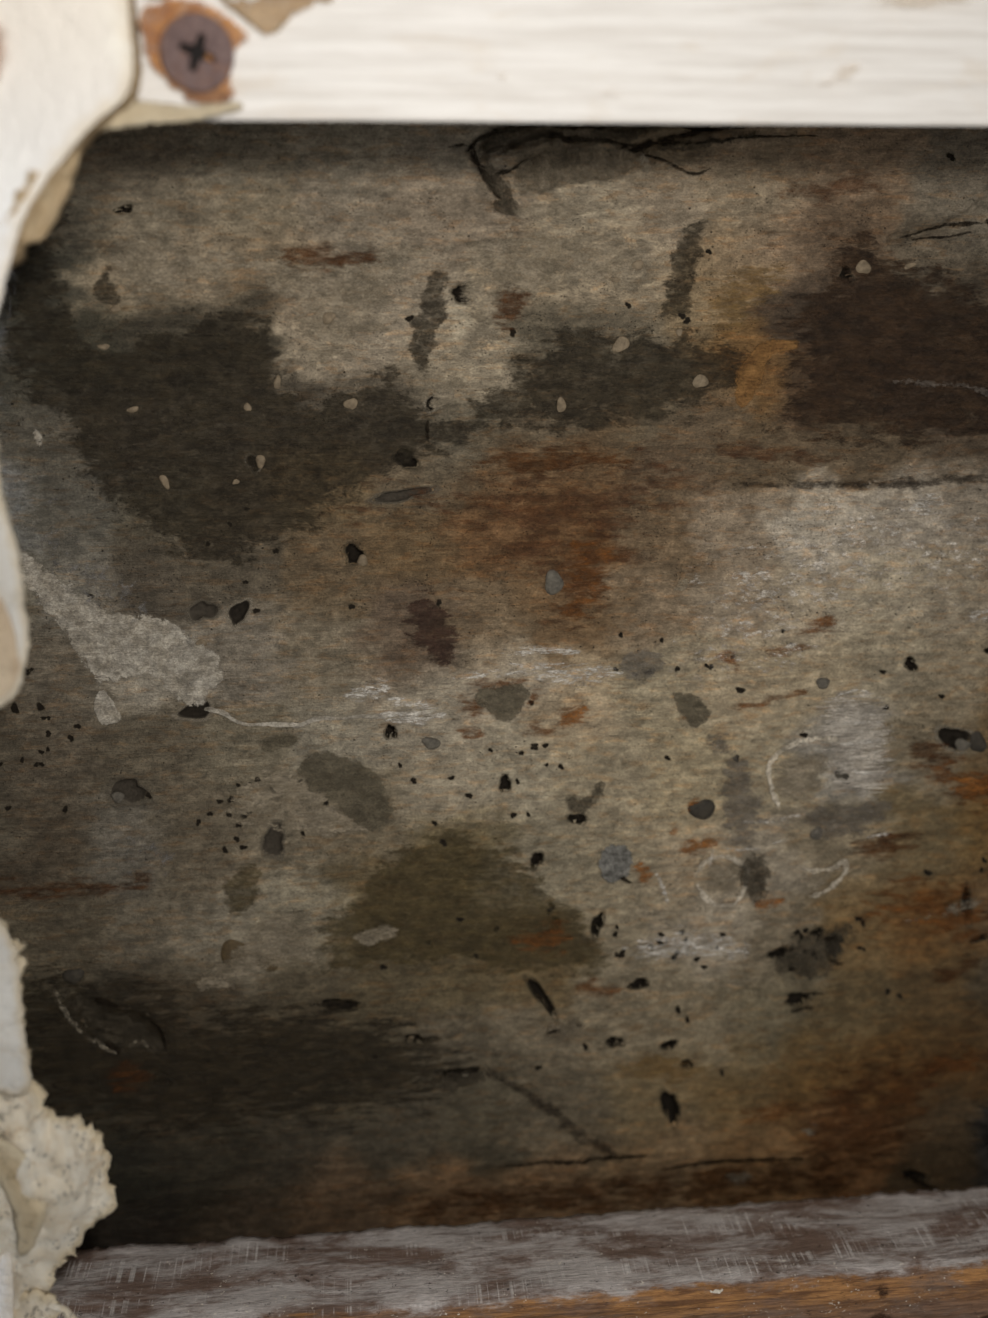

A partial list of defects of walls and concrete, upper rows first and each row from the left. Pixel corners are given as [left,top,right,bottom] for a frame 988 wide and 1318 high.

rust [139,0,249,104]
crack [451,123,817,215]
leakage [0,206,746,567]
leakage [762,231,988,449]
rust [403,589,459,666]
rust [456,446,681,629]